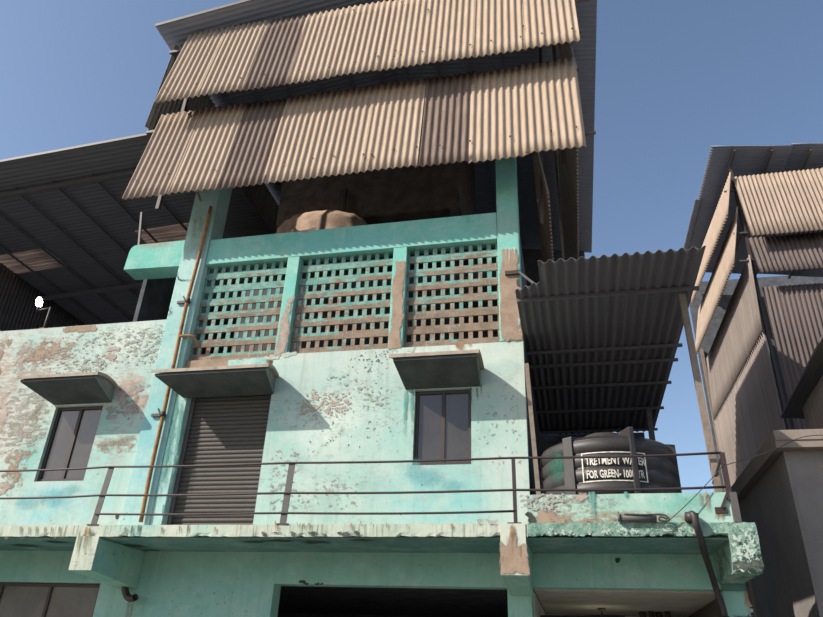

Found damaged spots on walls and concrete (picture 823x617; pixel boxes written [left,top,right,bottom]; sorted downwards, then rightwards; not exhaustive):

peeling [499,249,522,341]
peeling [14,324,163,373]
peeling [228,296,297,366]
peeling [299,261,416,452]
peeling [106,376,150,420]
peeling [0,388,49,495]
peeling [97,435,135,453]
water stain [20,526,91,549]
peeling [499,533,530,575]
peeling [520,493,640,535]
spalling [708,524,764,575]